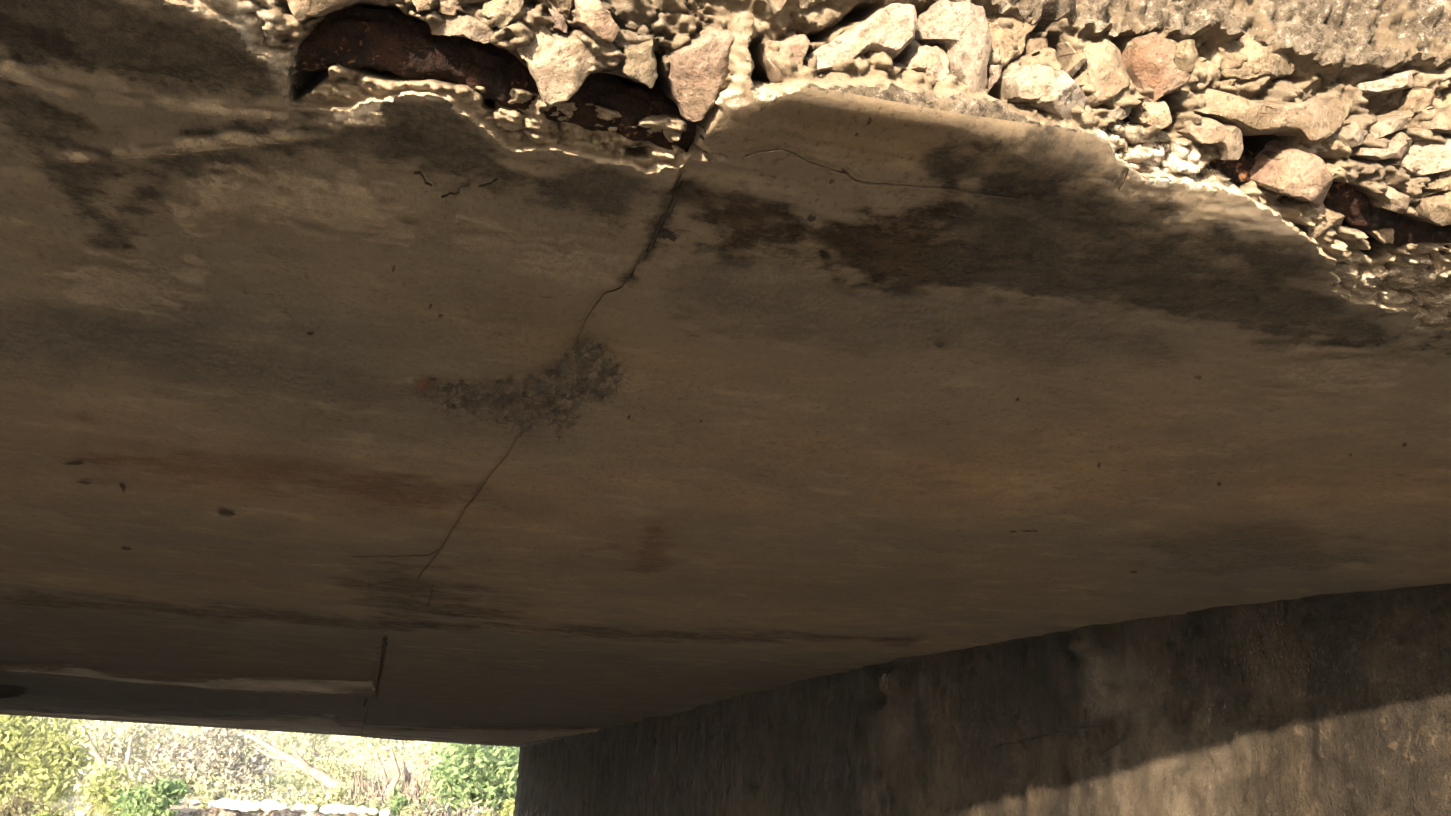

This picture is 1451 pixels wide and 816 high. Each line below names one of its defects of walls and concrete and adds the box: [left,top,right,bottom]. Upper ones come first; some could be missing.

damp [0,0,283,99]
damp [0,79,649,313]
spalling [165,0,780,174]
crack [558,168,684,371]
crack [745,149,1016,199]
damp [644,122,1451,362]
spalling [1054,21,1451,330]
crack [351,412,548,606]